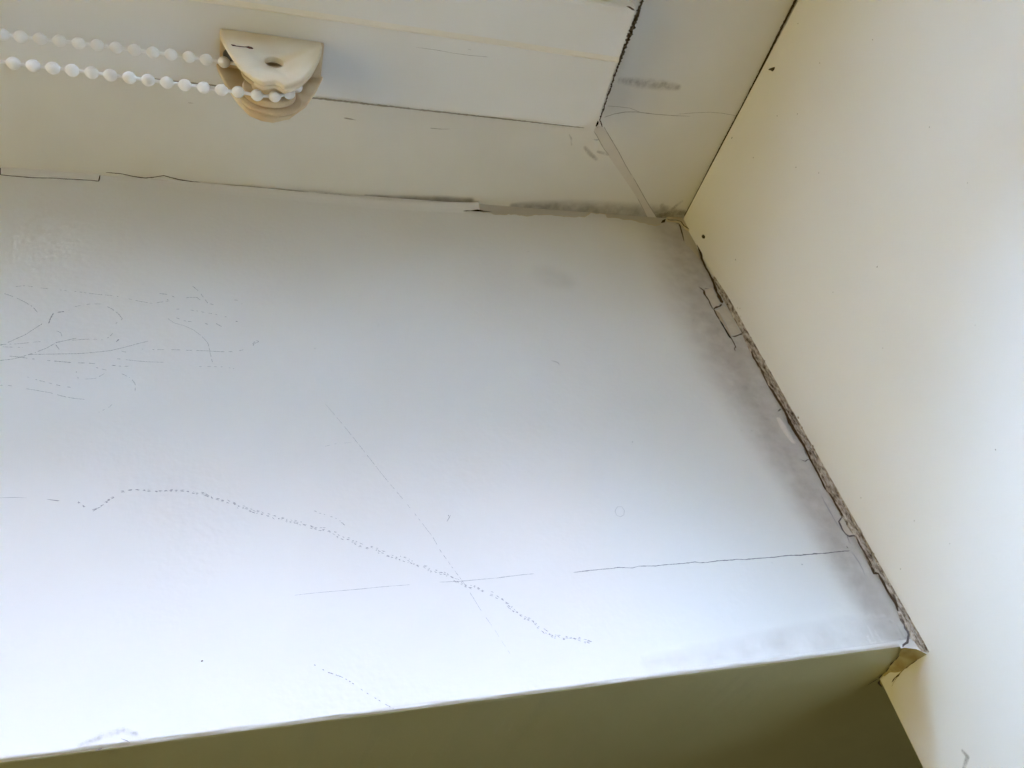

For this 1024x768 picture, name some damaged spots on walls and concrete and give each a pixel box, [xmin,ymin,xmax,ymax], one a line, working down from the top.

peeling [0,167,700,259]
crack [579,245,924,687]